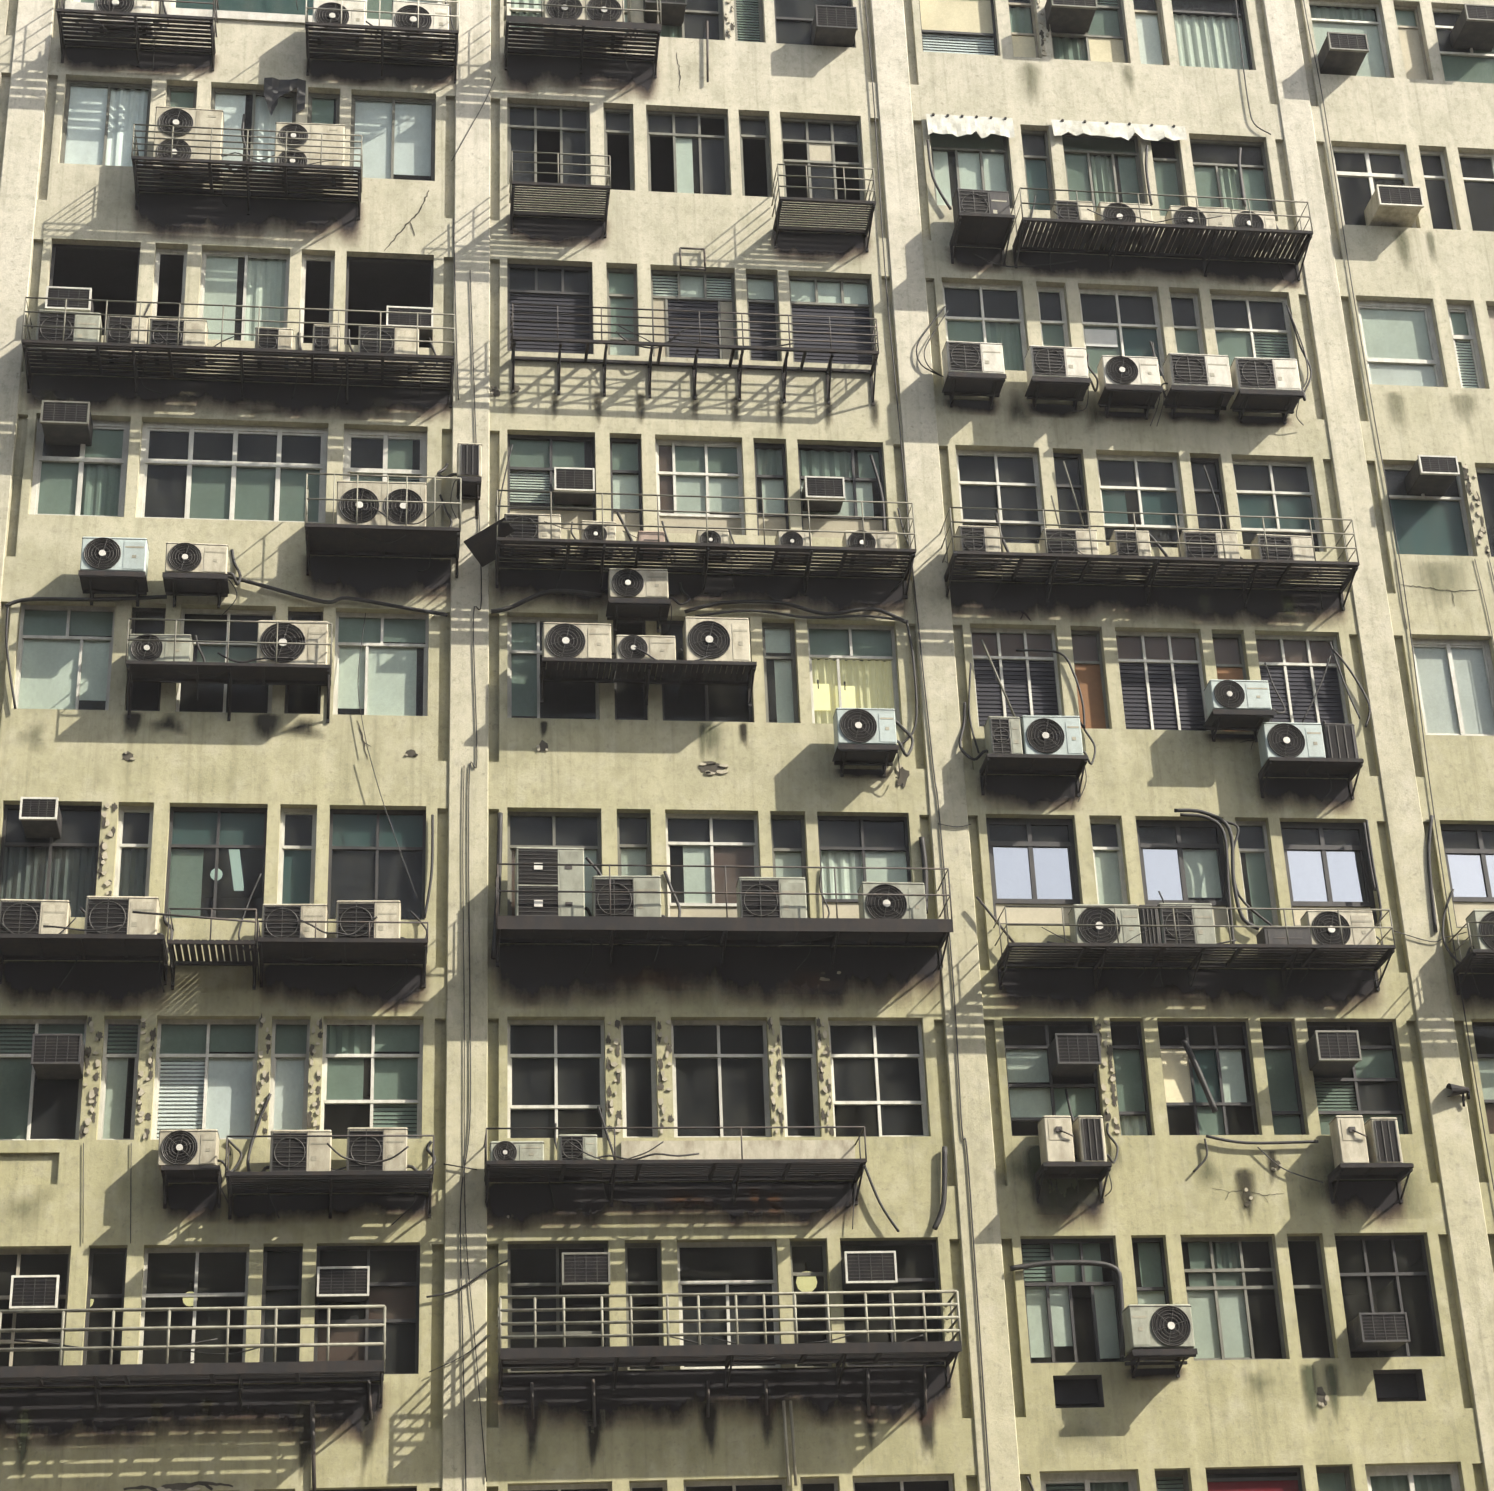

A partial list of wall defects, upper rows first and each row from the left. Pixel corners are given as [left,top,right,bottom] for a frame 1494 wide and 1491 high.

crack [384,190,429,251]
leakage [28,374,450,418]
leakage [496,944,941,1005]
peeling [79,1016,103,1138]
peeling [137,1018,156,1140]
peeling [606,1019,622,1133]
peeling [657,1020,674,1134]
leakage [499,1365,950,1464]
leakage [1302,1365,1338,1413]